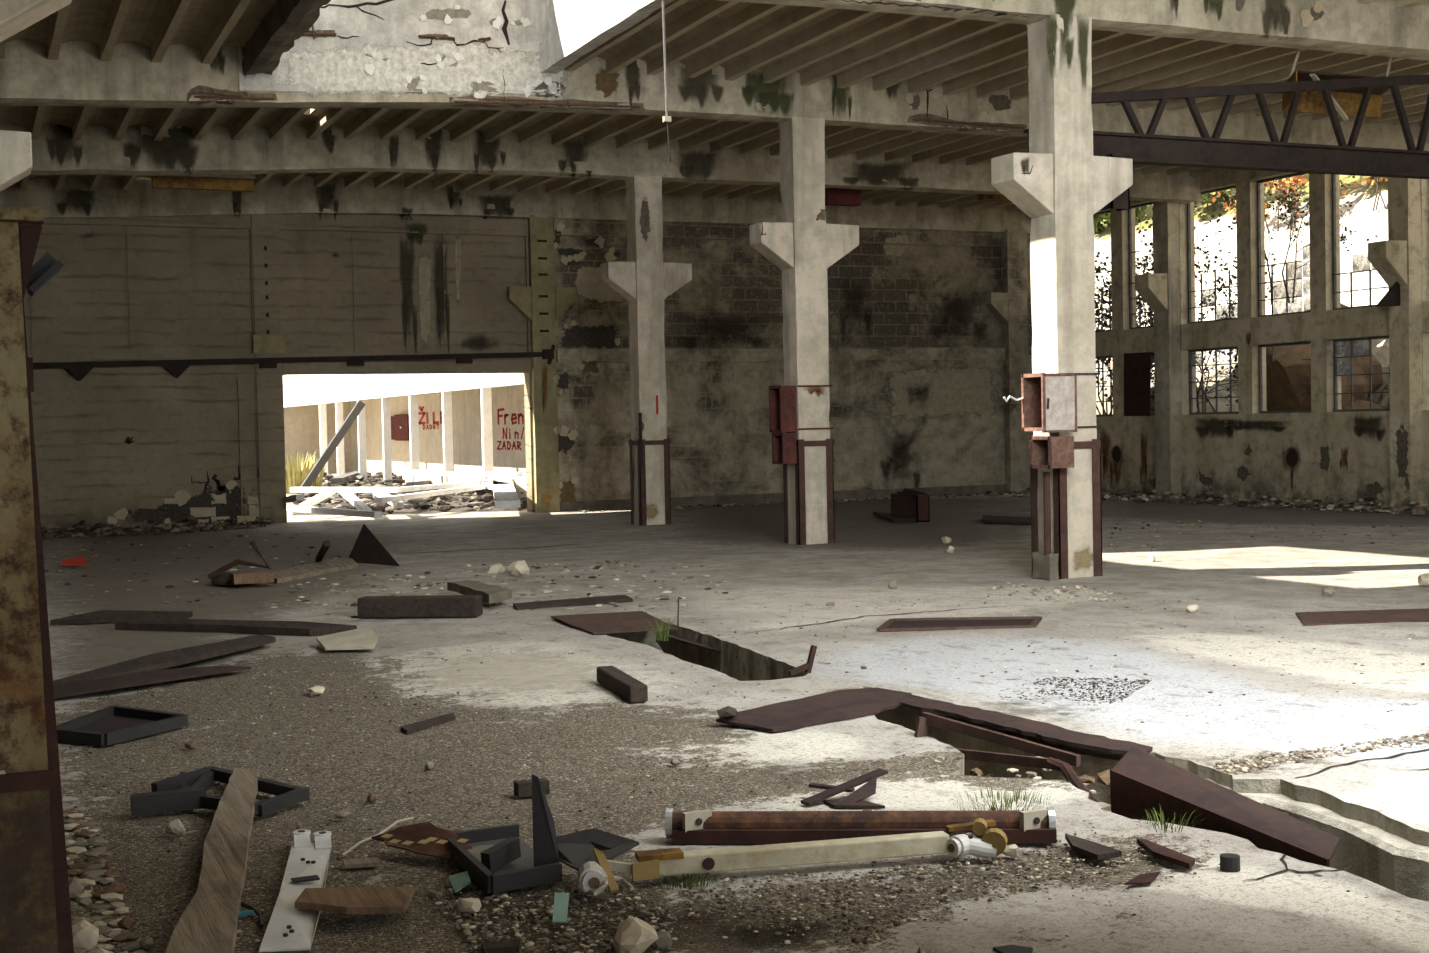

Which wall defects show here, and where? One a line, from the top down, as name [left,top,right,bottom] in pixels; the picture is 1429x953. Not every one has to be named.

spalling [302,26,337,39]
crack [321,0,510,94]
peeling [405,5,471,95]
peeling [477,15,531,42]
water stain [1047,17,1088,84]
water stain [1263,0,1290,37]
water stain [742,72,793,113]
water stain [399,208,487,352]
water stain [1196,418,1285,437]
peeling [107,480,260,526]
crack [1294,748,1429,778]
crack [1248,854,1352,880]